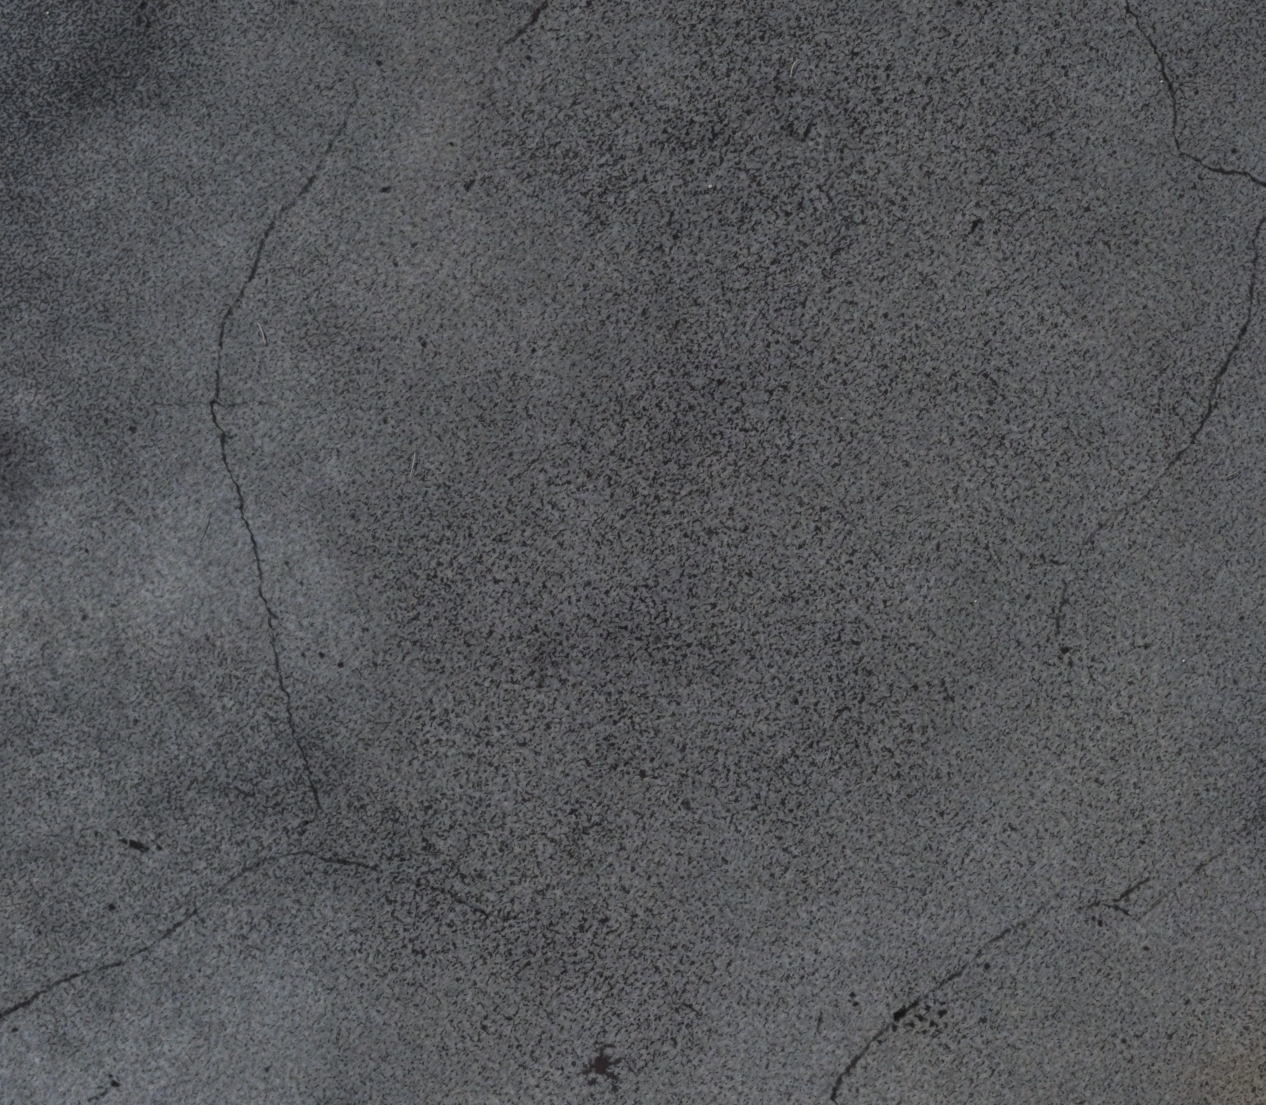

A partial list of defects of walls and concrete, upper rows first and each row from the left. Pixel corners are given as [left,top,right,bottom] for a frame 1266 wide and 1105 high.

crack [504,0,547,43]
crack [1126,0,1266,185]
crack [1143,218,1266,499]
crack [0,94,374,1018]
crack [1055,585,1067,636]
crack [431,886,536,921]
crack [830,820,1255,1103]